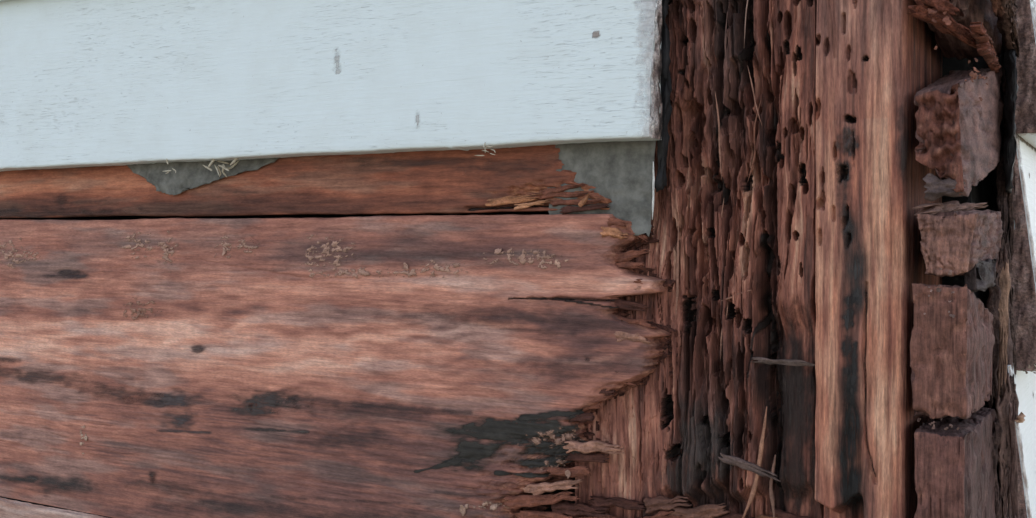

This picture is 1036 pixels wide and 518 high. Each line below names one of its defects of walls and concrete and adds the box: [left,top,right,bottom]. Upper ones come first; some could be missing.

peeling [923,0,1020,85]
spalling [0,183,628,227]
spalling [942,196,968,204]
peeling [613,234,650,284]
crack [508,297,619,309]
spalling [928,270,964,318]
peeling [986,132,1036,518]
damp [414,409,588,478]
peeling [514,436,647,518]
spalling [0,496,112,518]
peeling [669,503,730,518]